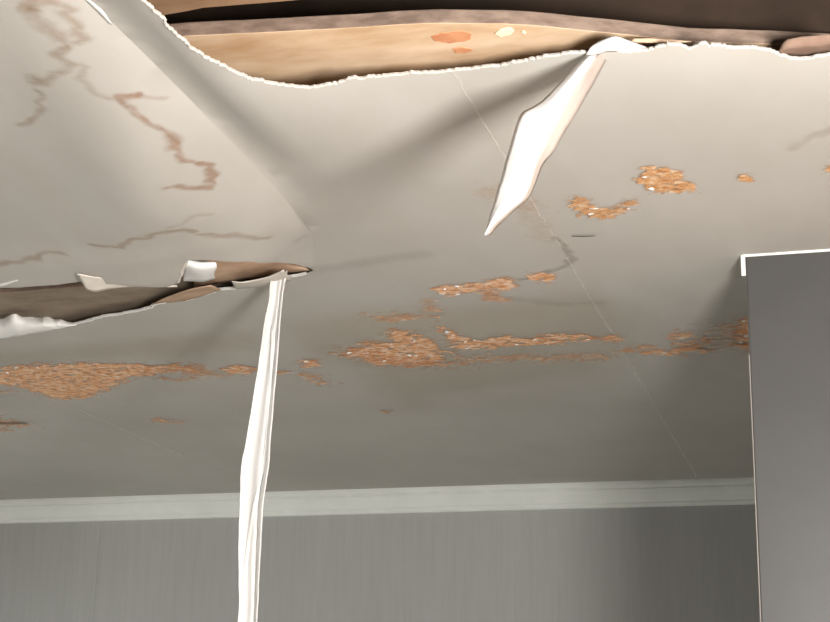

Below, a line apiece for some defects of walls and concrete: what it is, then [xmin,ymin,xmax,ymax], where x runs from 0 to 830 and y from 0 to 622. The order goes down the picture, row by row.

peeling [633,166,701,195]
peeling [566,195,640,220]
peeling [430,277,520,302]
peeling [526,271,557,284]
peeling [329,307,719,369]
peeling [0,360,258,401]